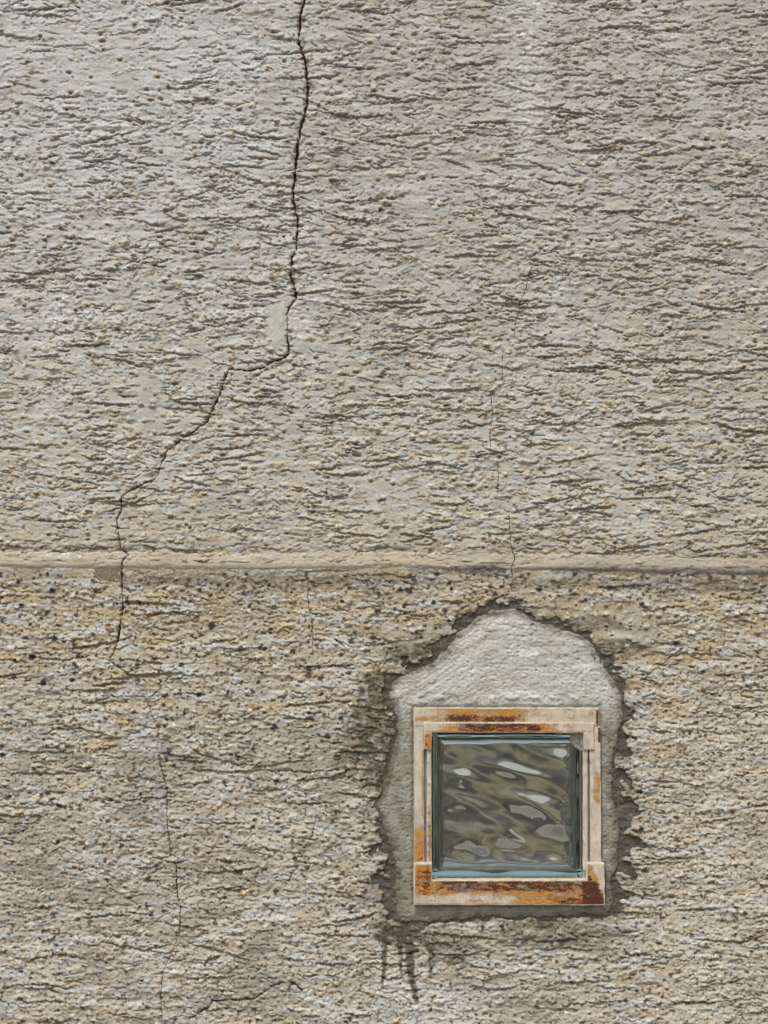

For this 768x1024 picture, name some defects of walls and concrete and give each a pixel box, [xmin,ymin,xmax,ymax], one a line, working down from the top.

crack [109,0,320,1012]
leakage [336,609,496,801]
rust [415,709,604,904]
crack [190,981,305,1018]
leakage [369,814,490,1002]